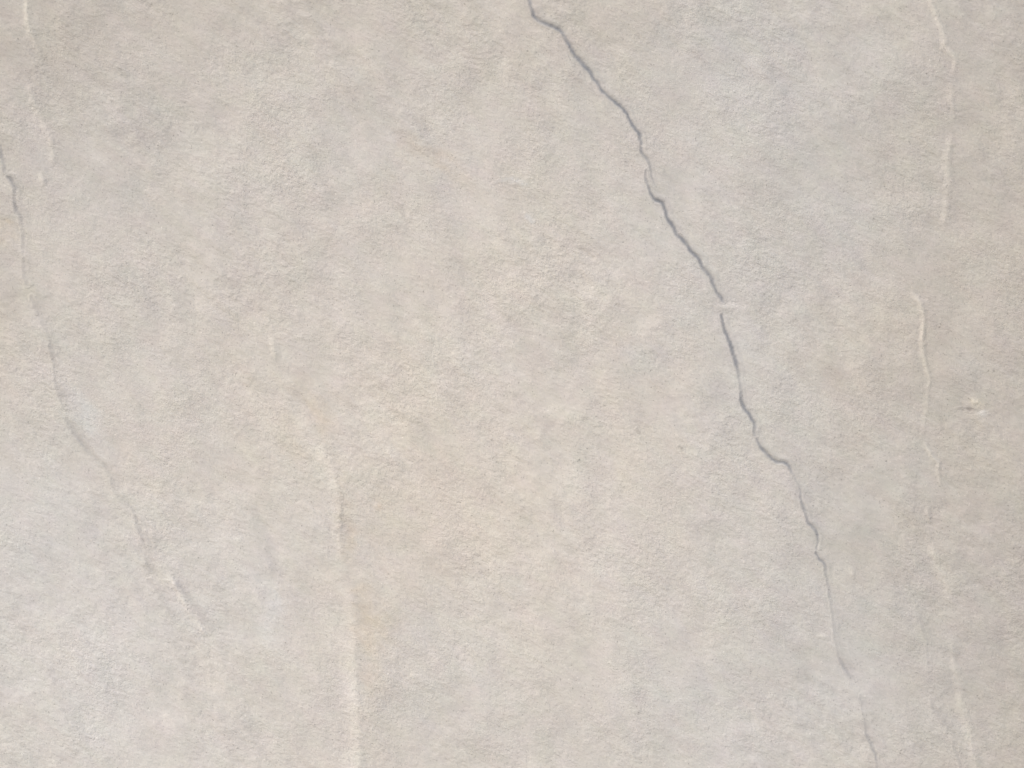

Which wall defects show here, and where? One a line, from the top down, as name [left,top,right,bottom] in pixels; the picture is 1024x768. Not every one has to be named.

crack [525,0,883,768]